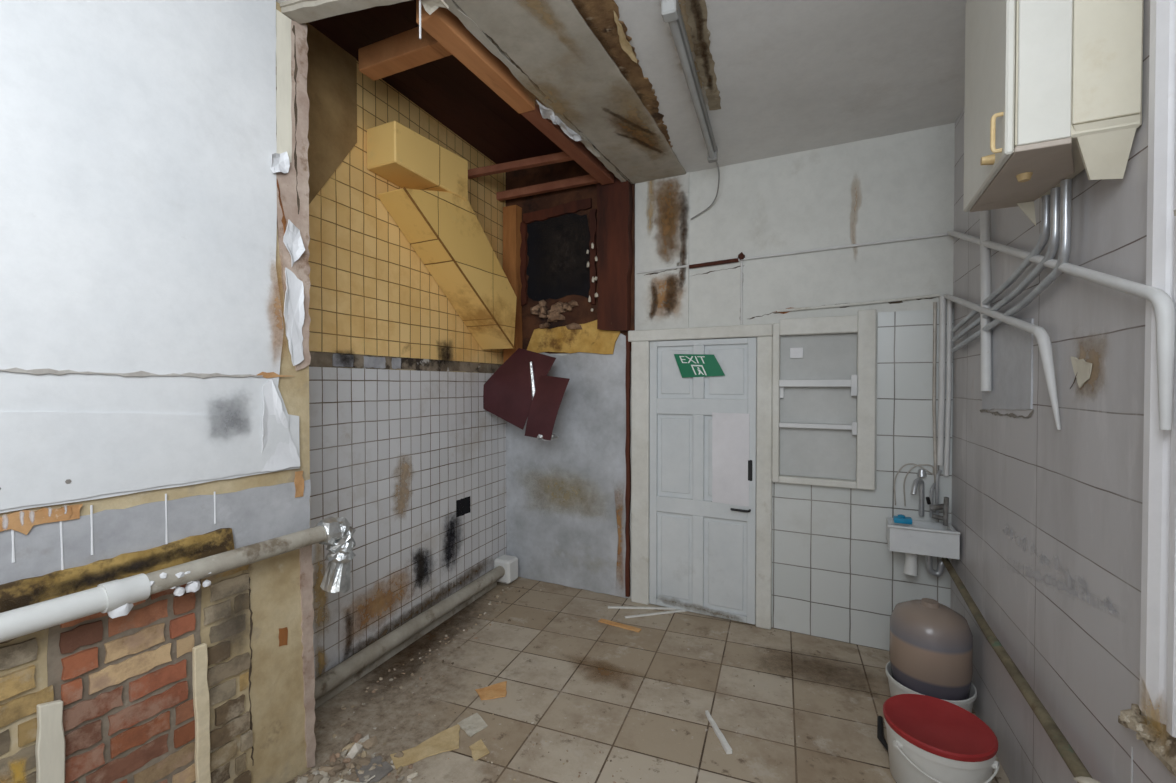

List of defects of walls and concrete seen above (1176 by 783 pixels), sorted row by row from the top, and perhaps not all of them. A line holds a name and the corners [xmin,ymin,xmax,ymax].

spalling [419,0,449,39]
spalling [572,0,673,147]
spalling [678,0,721,110]
peeling [536,100,601,157]
spalling [271,9,501,373]
spalling [530,243,598,330]
peeling [261,379,304,498]
peeling [0,504,83,535]
leakage [395,458,410,514]
leakage [414,551,431,586]
leakage [445,520,460,566]
flaking render [0,564,253,783]